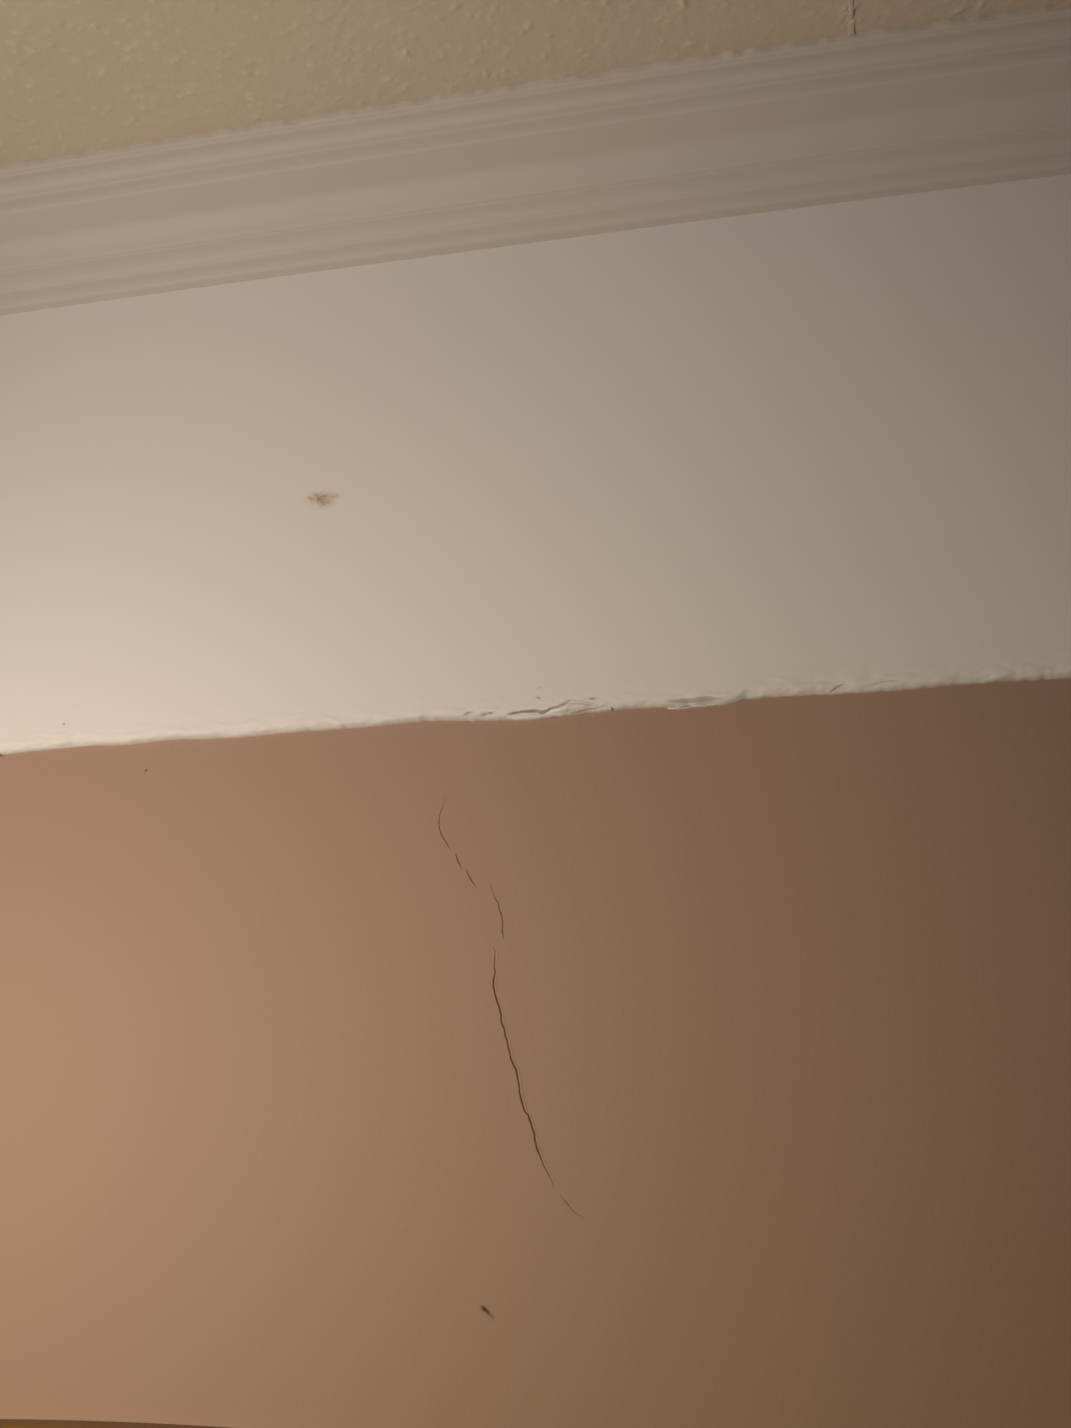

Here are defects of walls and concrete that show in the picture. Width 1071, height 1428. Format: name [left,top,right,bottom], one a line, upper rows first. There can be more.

crack [492,909,558,1189]